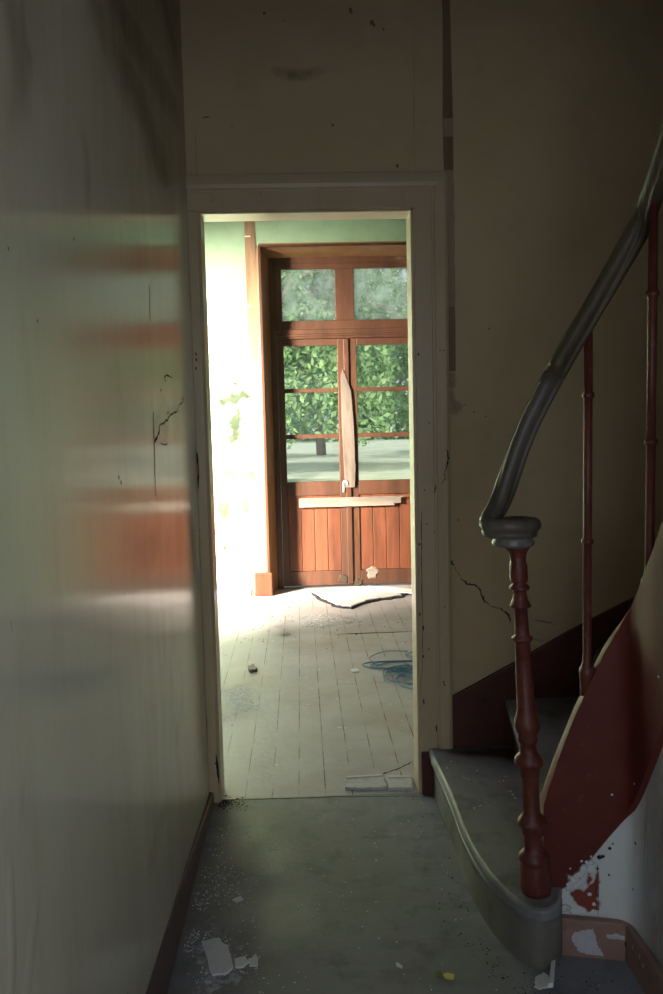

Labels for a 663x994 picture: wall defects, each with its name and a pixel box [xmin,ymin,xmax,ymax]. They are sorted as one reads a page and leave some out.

crack [153,374,184,488]
peeling [209,351,263,595]
spalling [419,512,435,671]
crack [451,561,511,622]
peeling [562,843,614,912]
peeling [572,929,644,968]